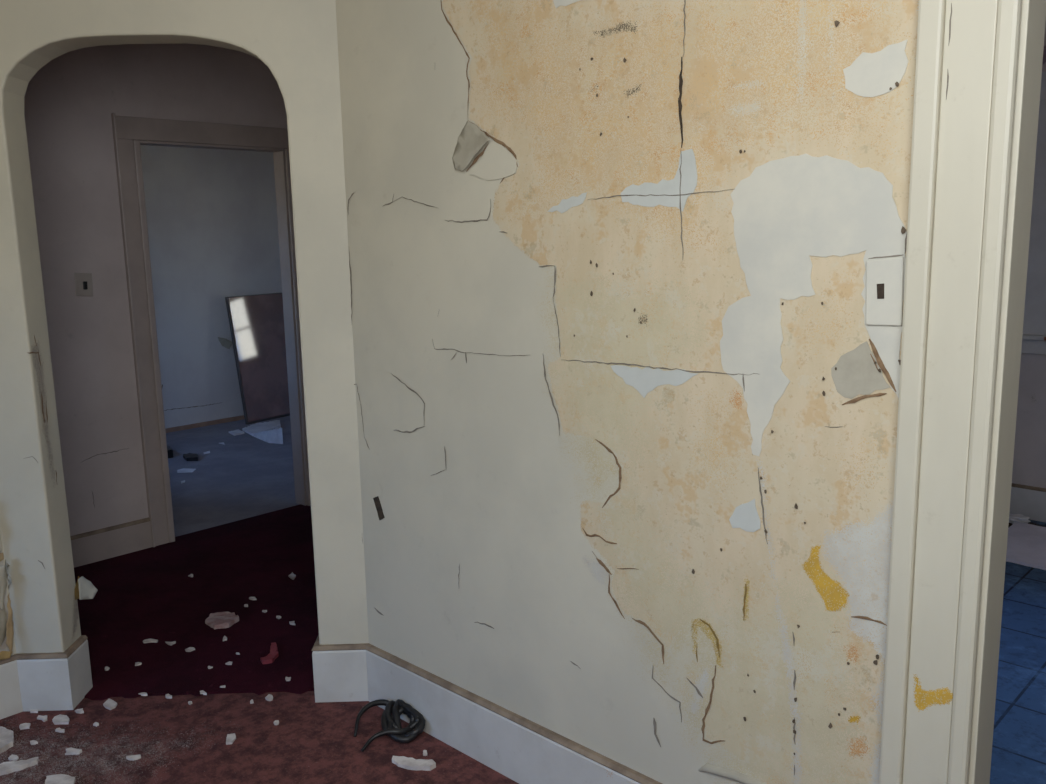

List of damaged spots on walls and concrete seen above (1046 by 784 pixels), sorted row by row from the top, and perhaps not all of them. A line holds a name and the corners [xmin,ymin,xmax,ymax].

crack [588,0,733,248]
crack [384,195,506,233]
crack [346,252,354,322]
crack [432,265,756,436]
crack [392,374,425,433]
peeling [442,0,919,784]
crack [595,439,622,508]
crack [758,470,768,544]
peeling [0,537,14,660]